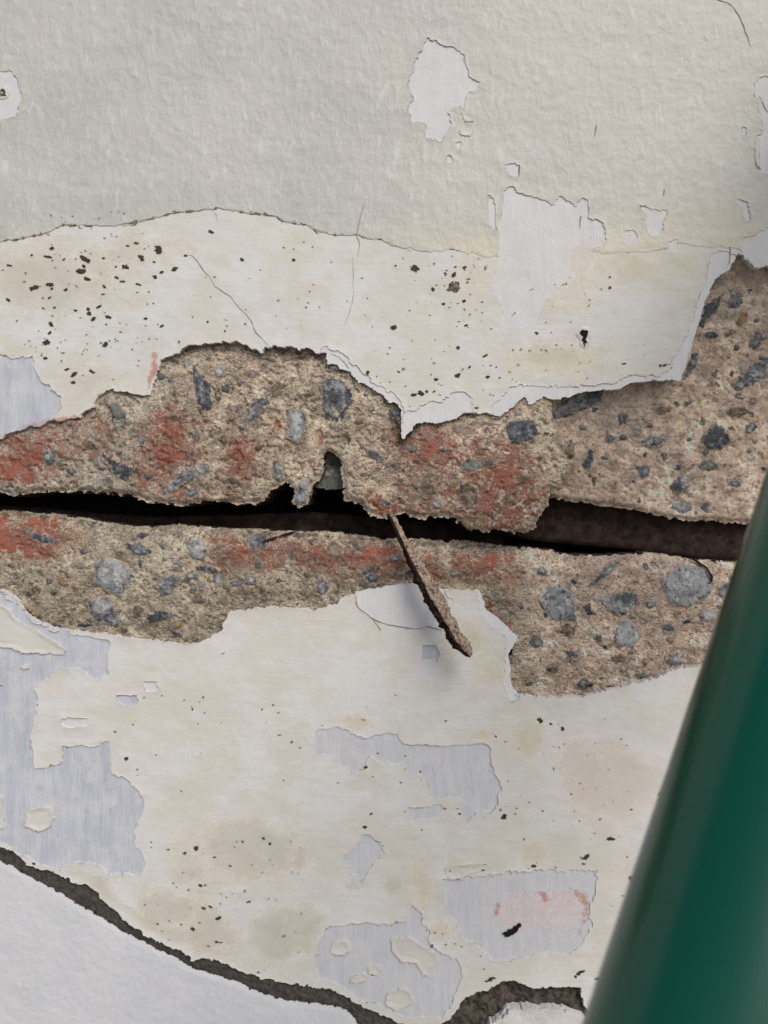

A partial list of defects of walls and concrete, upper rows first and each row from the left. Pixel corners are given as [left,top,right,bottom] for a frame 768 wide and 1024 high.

peeling [408,38,479,163]
crack [4,202,410,323]
crack [184,254,268,345]
corrosion [0,412,116,492]
corrosion [124,403,206,501]
corrosion [221,422,263,499]
corrosion [0,513,81,565]
corrosion [209,530,406,582]
crack [0,487,748,584]
spalling [0,227,768,875]
peeling [442,863,598,960]
peeling [315,906,587,1024]